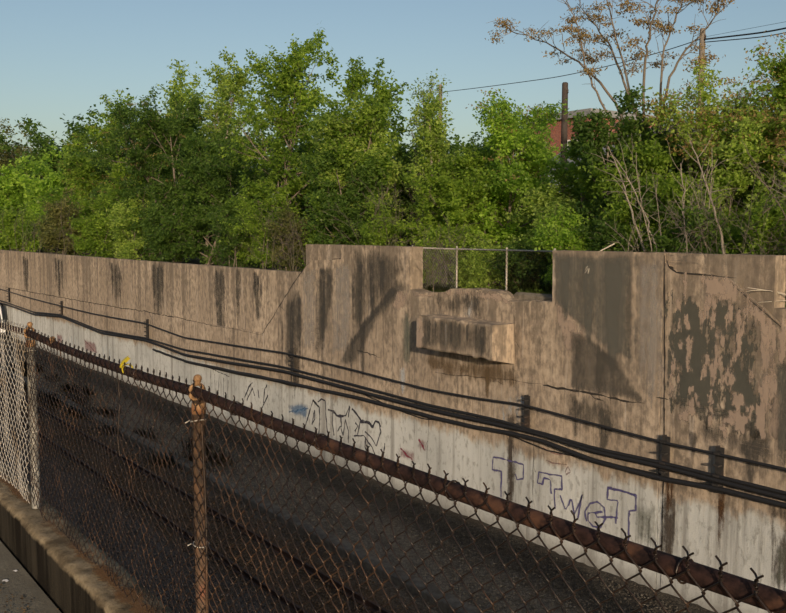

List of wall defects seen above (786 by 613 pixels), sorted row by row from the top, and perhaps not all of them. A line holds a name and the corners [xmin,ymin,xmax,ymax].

leakage [153,263,163,313]
leakage [215,271,225,326]
leakage [320,269,331,330]
leakage [350,261,396,377]
crack [436,255,781,435]
crack [658,482,666,551]